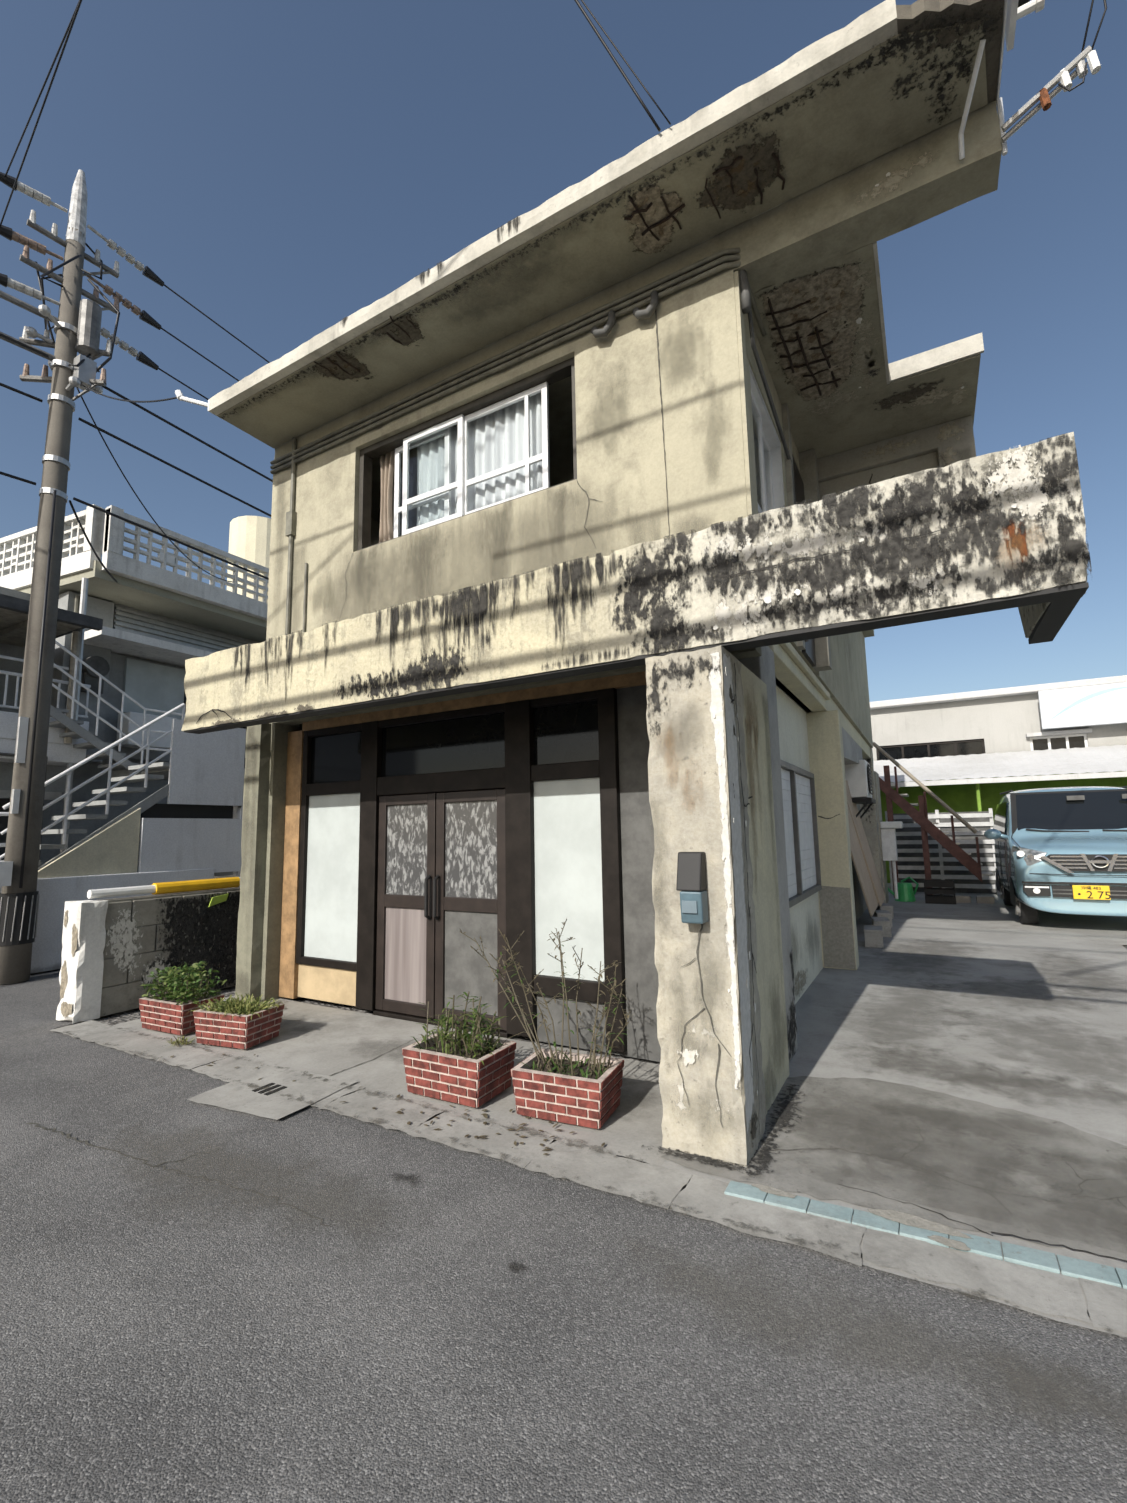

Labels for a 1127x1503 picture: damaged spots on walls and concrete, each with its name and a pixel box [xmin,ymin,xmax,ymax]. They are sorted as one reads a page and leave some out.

damp [891,26,976,125]
spalling [623,133,786,254]
spalling [760,260,943,416]
damp [337,434,1092,736]
corrosion [1002,518,1028,563]
crack [677,663,759,1128]
crack [758,1116,1127,1262]